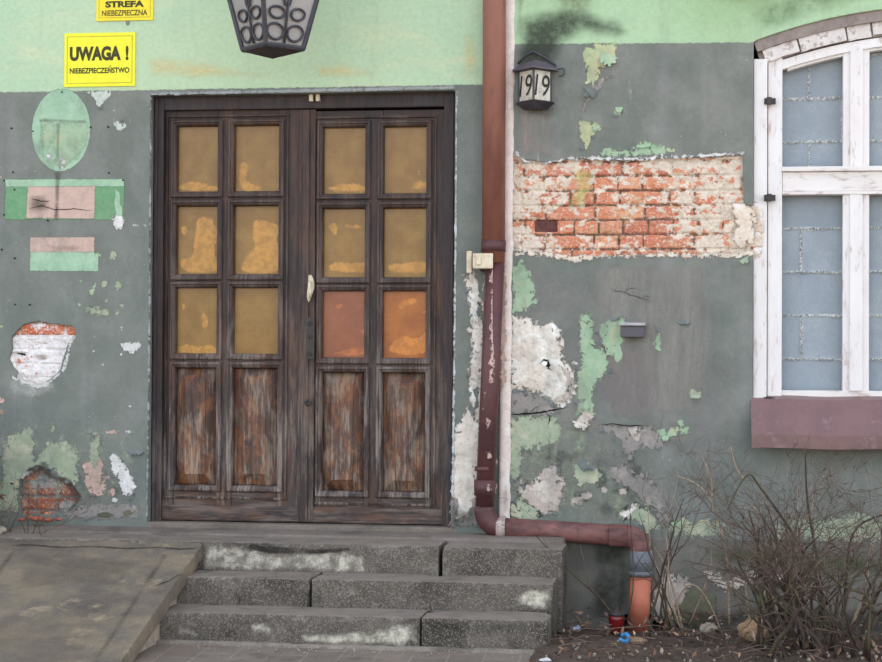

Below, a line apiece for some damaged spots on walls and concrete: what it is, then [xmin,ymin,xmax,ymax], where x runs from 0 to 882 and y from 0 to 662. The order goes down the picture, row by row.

crack [29,199,92,211]
flaking render [511,43,764,314]
flaking render [10,321,76,389]
peeling [0,425,139,522]
flaking render [448,270,495,530]
peeling [509,313,732,538]
leakage [207,544,363,571]